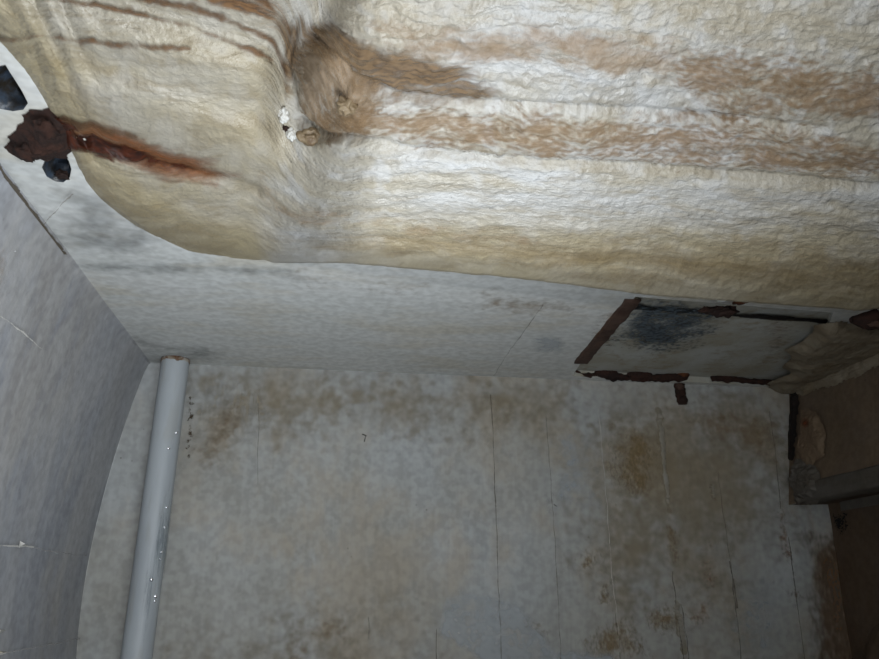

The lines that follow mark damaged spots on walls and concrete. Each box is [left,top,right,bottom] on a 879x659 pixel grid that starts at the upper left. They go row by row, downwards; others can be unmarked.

damp [60,0,879,178]
corrosion [4,108,225,180]
corrosion [574,299,690,383]
damp [608,299,716,352]
corrosion [710,376,773,386]
corrosion [849,309,879,330]
crack [490,395,498,564]
damp [815,511,853,659]